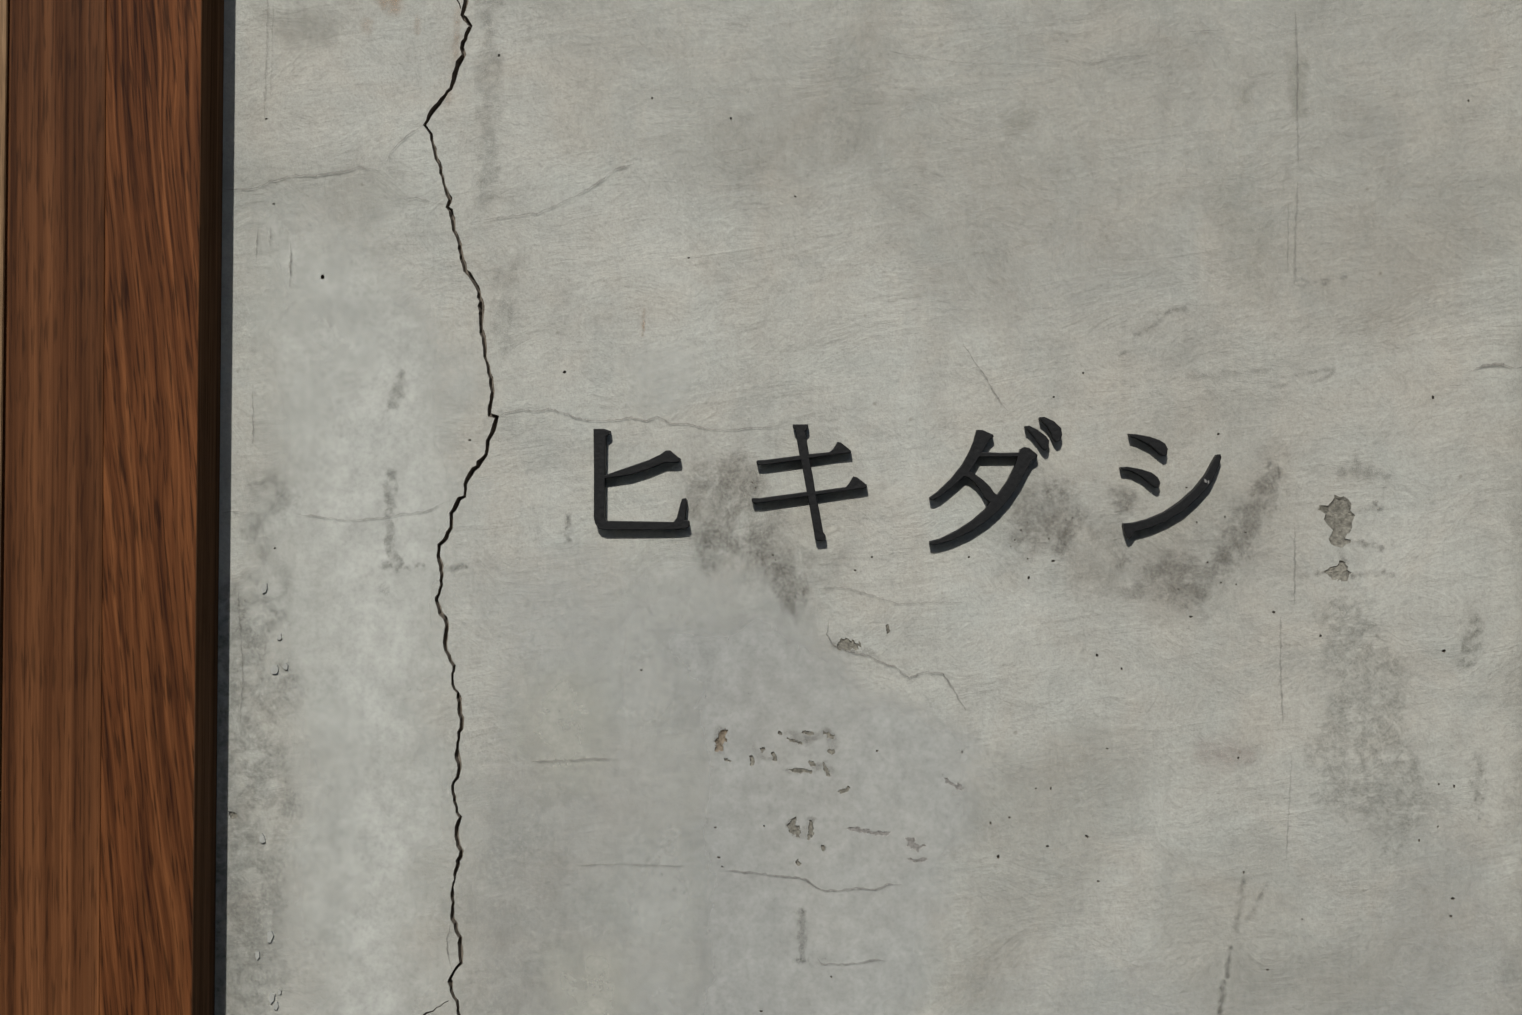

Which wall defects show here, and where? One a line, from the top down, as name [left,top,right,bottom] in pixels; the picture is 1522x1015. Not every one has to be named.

crack [405,0,701,1015]
spalling [1318,495,1355,581]
spalling [714,730,731,762]
spalling [749,730,850,794]
spalling [787,817,825,851]
spalling [846,826,928,863]